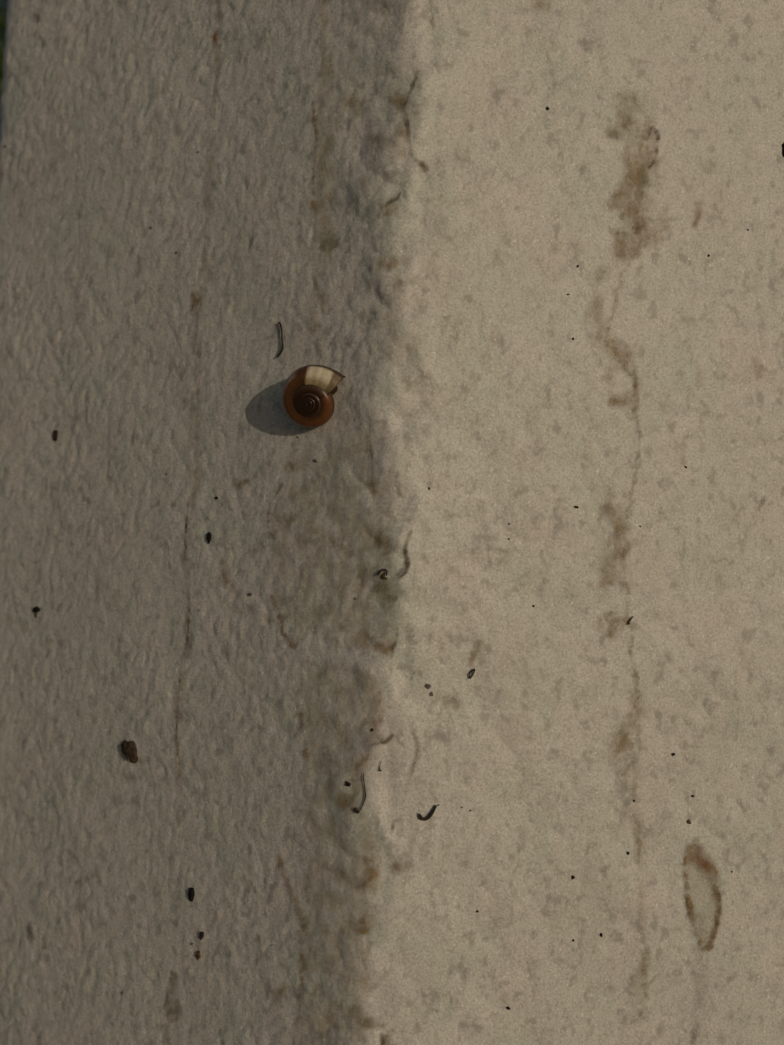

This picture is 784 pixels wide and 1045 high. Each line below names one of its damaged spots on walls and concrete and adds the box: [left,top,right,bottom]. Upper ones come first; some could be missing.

leakage [615,128,660,234]